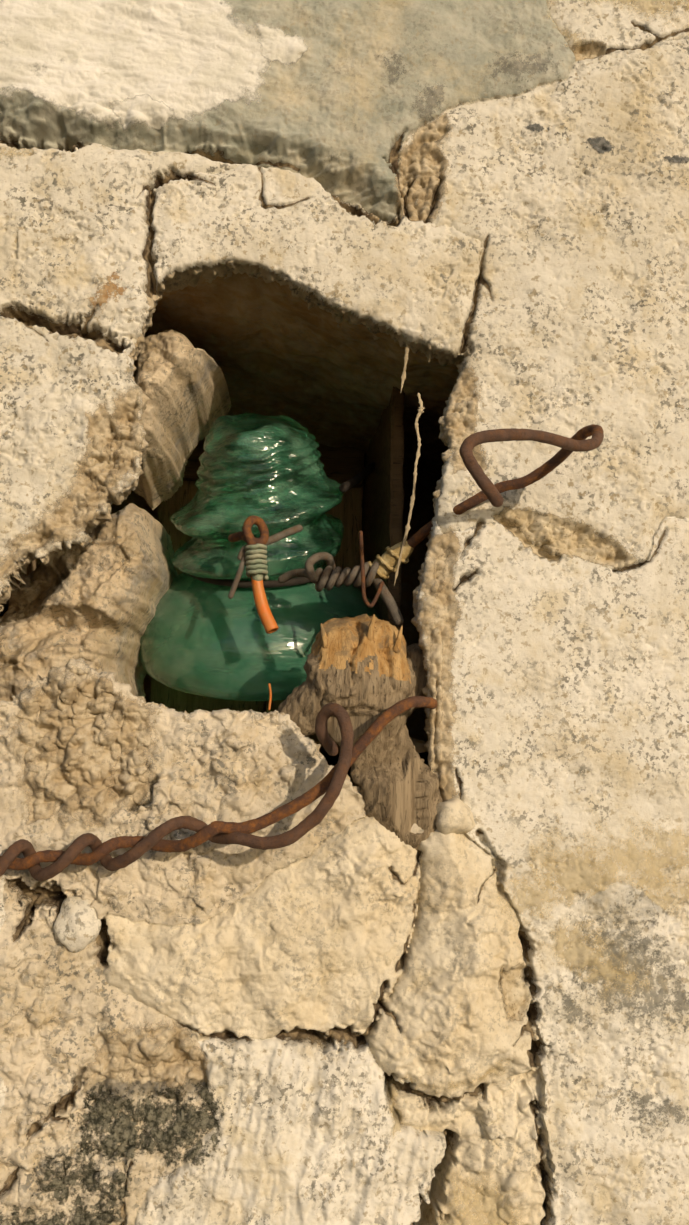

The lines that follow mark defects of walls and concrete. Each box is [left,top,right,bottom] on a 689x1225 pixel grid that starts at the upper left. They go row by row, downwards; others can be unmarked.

crack [0,304,125,354]
crack [460,235,493,354]
spalling [443,365,487,473]
spalling [0,385,145,590]
spalling [418,507,666,802]
spalling [7,661,156,827]
crack [8,879,67,942]
crack [95,919,114,965]
crack [176,851,423,1049]
crack [513,930,548,1067]
crack [26,1080,80,1139]
crack [529,1100,553,1225]